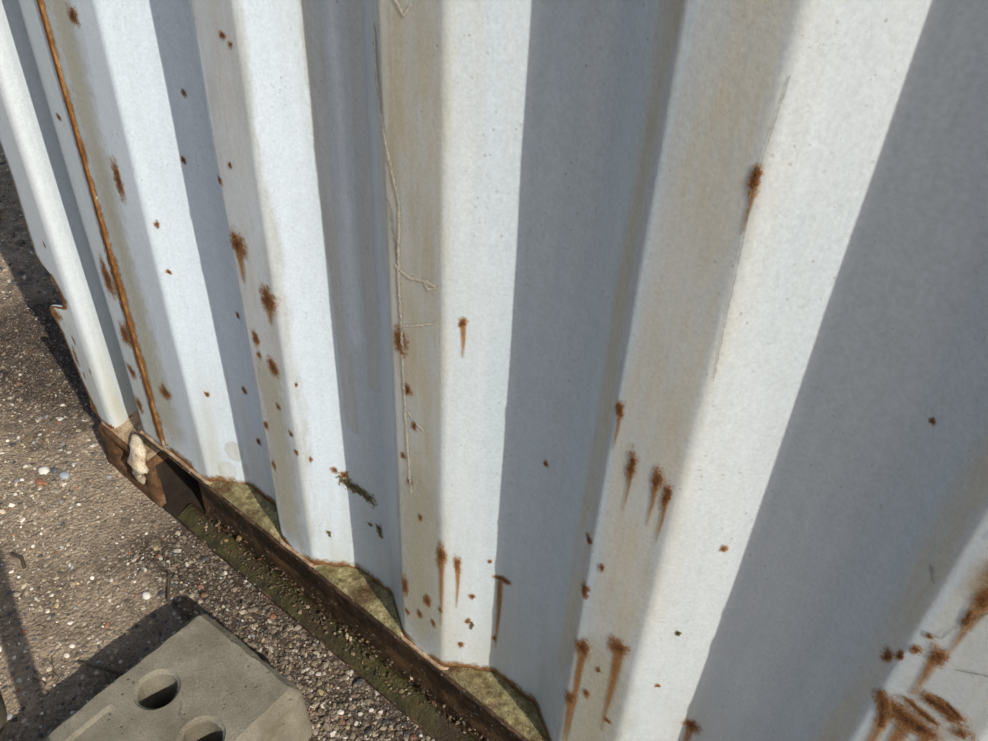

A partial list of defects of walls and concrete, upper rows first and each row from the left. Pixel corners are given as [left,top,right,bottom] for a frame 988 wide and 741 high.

corrosion [743,164,763,229]
corrosion [36,0,195,470]
corrosion [230,231,247,280]
corrosion [259,286,277,323]
corrosion [252,331,279,378]
corrosion [614,401,624,444]
corrosion [204,476,278,513]
corrosion [624,445,638,504]
corrosion [648,466,673,536]
corrosion [304,542,475,645]
corrosion [492,575,511,640]
corrosion [880,575,988,688]